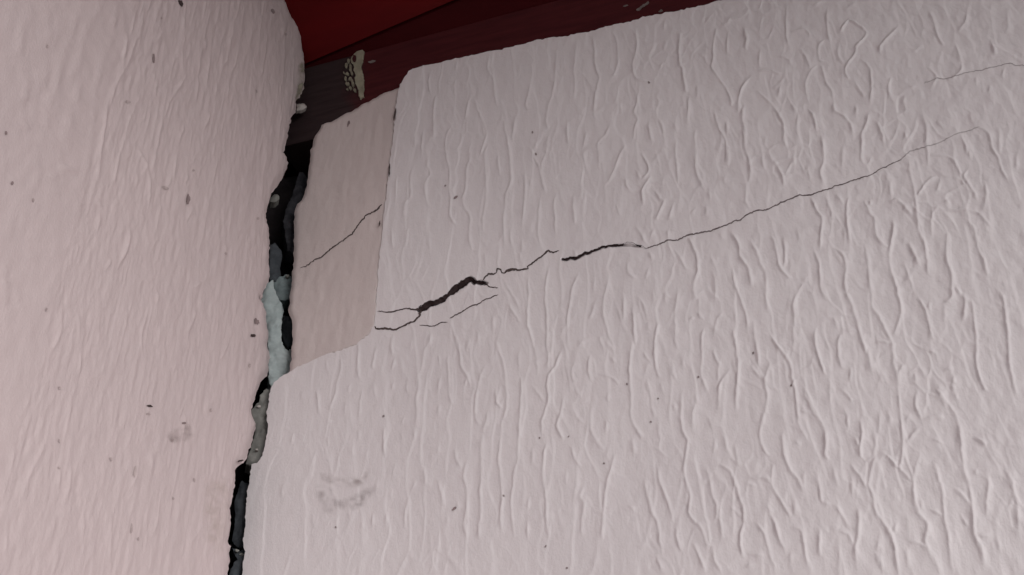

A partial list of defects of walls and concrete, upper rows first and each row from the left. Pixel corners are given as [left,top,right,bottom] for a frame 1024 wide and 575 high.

crack [925,63,1024,83]
crack [375,127,977,331]
crack [227,172,382,575]